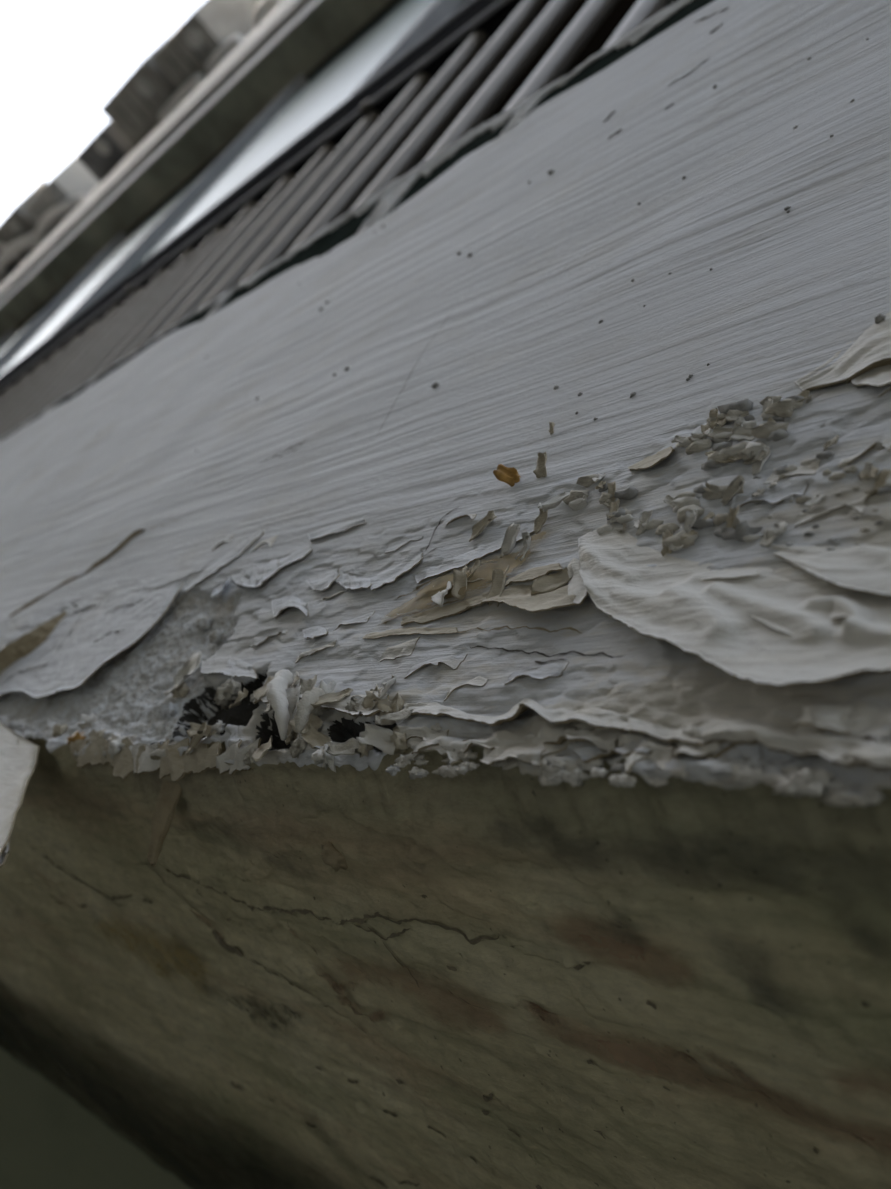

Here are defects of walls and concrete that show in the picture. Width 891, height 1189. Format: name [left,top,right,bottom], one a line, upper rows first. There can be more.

peeling [0,311,891,868]
crack [140,863,366,1033]